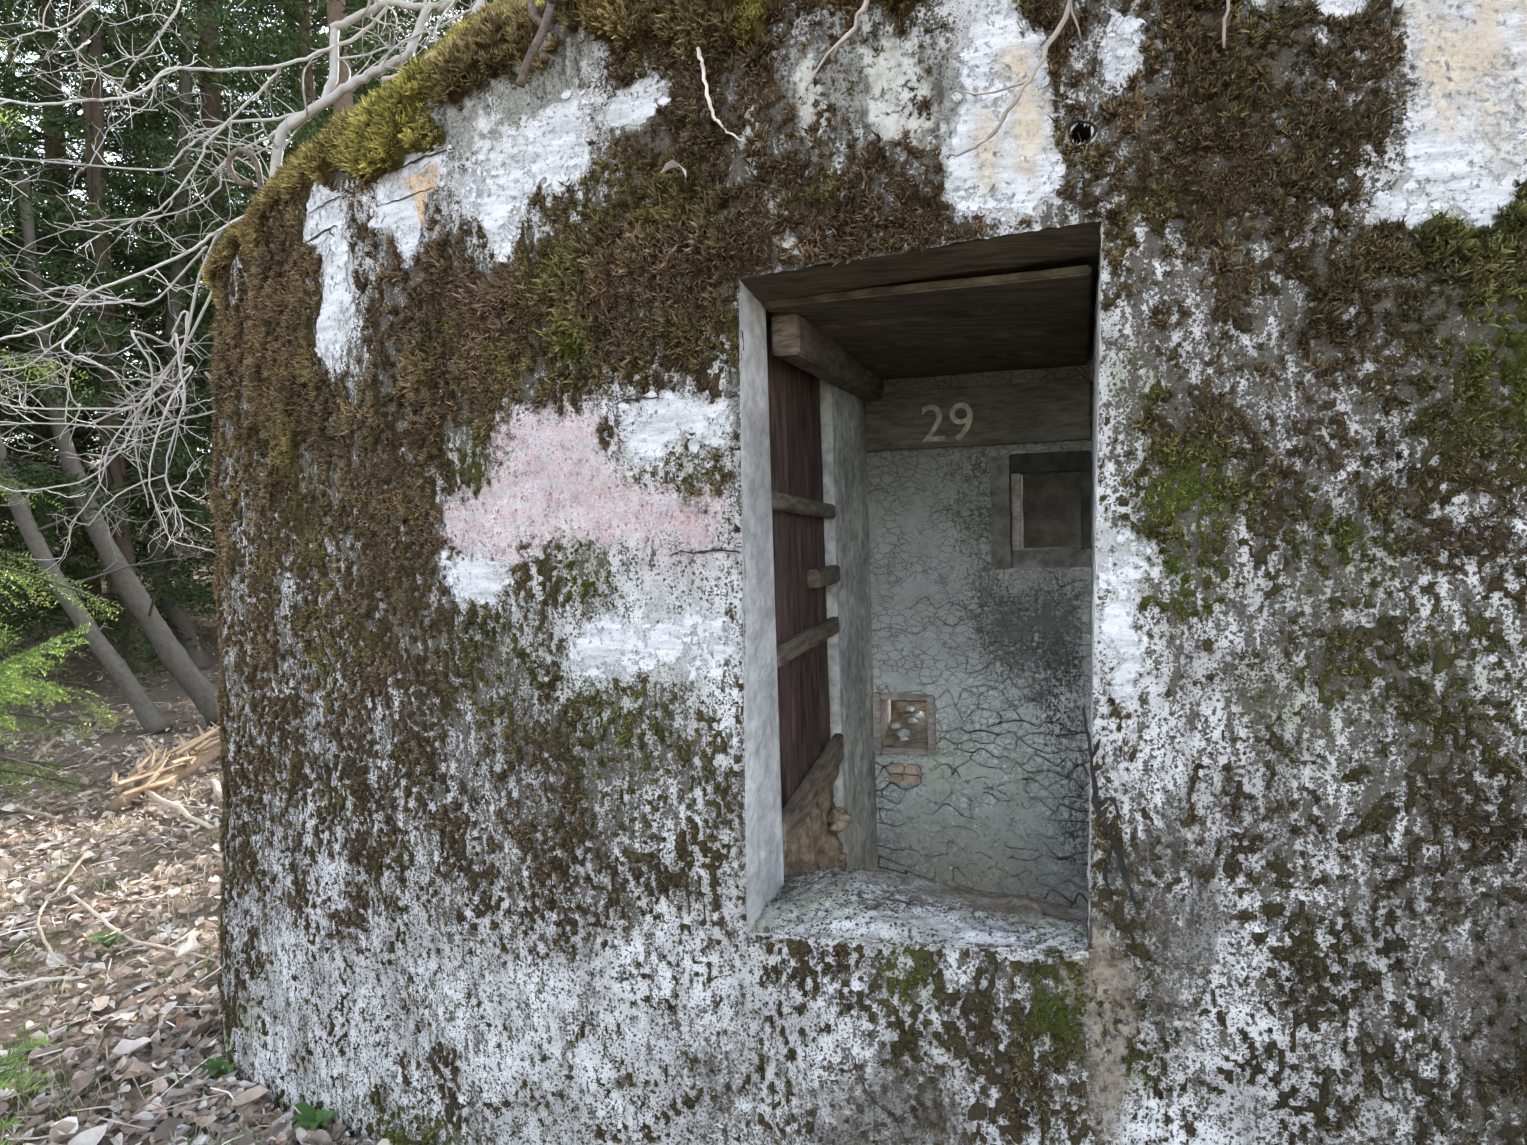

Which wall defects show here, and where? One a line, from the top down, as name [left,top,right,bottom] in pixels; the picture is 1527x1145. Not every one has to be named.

crack [874,707,1142,938]